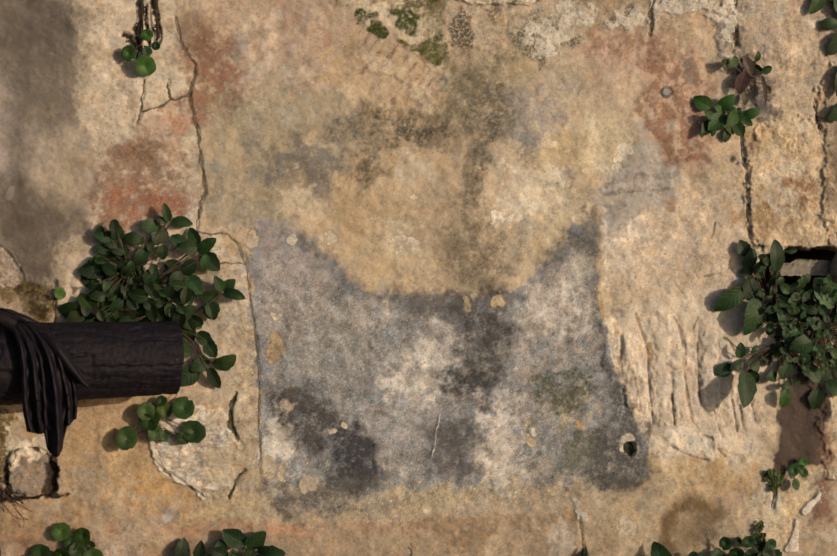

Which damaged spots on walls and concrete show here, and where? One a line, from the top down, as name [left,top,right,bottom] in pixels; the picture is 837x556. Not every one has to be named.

leakage [355,69,504,183]
leakage [0,192,70,277]
crack [122,0,262,499]
leakage [406,232,515,411]
flaking render [36,434,49,455]
flaking render [149,438,206,500]
leakage [266,386,384,519]
leakage [426,418,482,480]
leakage [556,373,652,490]
leakage [773,371,832,474]